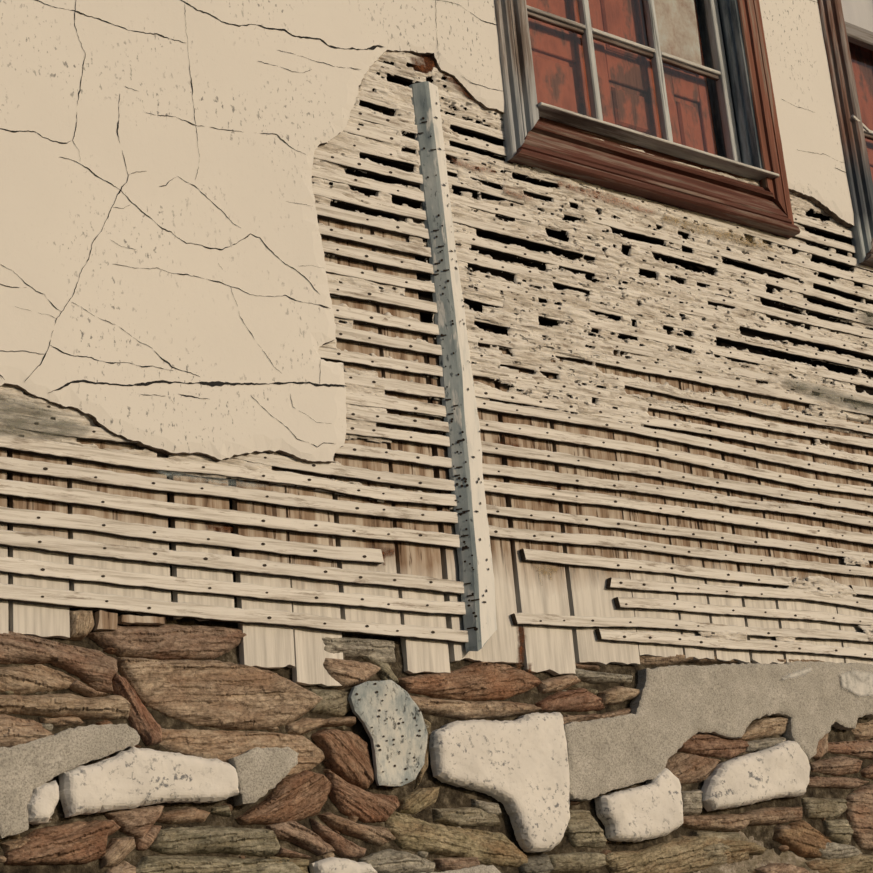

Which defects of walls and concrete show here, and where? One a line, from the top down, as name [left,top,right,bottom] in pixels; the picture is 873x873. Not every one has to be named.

crack [0,0,383,447]
spalling [311,51,873,443]
spalling [0,385,157,457]
spalling [744,432,848,466]
spalling [167,452,286,482]
spalling [331,479,407,491]
spalling [787,576,857,598]
spalling [698,630,747,642]